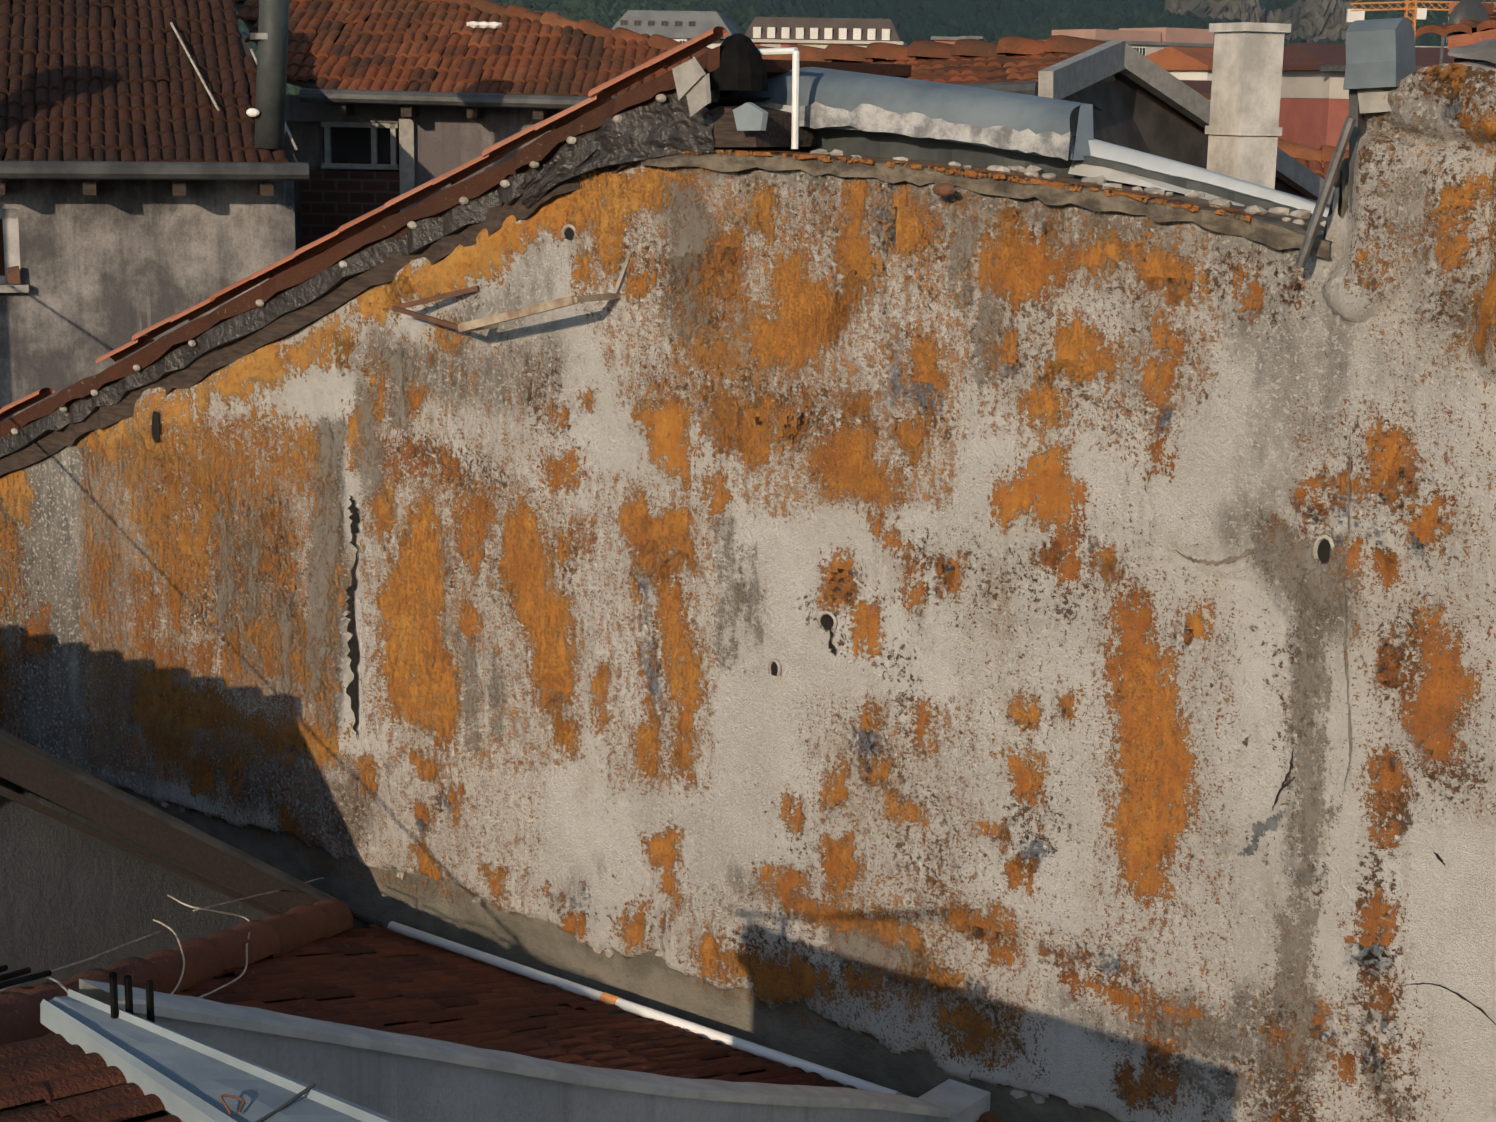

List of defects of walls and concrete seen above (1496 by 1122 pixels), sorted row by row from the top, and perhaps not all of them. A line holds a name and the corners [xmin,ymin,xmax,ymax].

damp [1344,63,1496,406]
damp [0,468,58,739]
crack [345,495,360,740]
damp [813,543,887,666]
damp [955,574,1008,689]
crack [1237,750,1296,856]
damp [1336,883,1412,951]